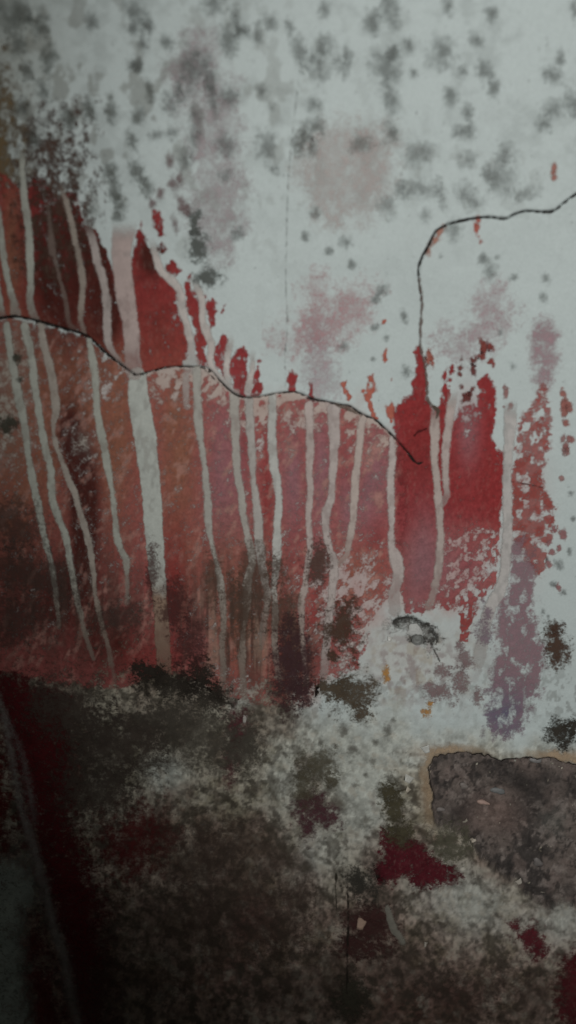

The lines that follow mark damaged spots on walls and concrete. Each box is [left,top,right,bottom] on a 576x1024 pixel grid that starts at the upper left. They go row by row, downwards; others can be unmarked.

damp [0,89,386,831]
peeling [152,210,263,397]
crack [0,194,576,465]
peeling [286,370,298,392]
peeling [341,374,395,423]
damp [387,436,405,603]
flaking render [387,617,445,662]
damp [424,401,573,741]
damp [544,716,576,751]
damp [378,778,474,866]
spalling [405,745,576,909]
damp [335,865,405,966]